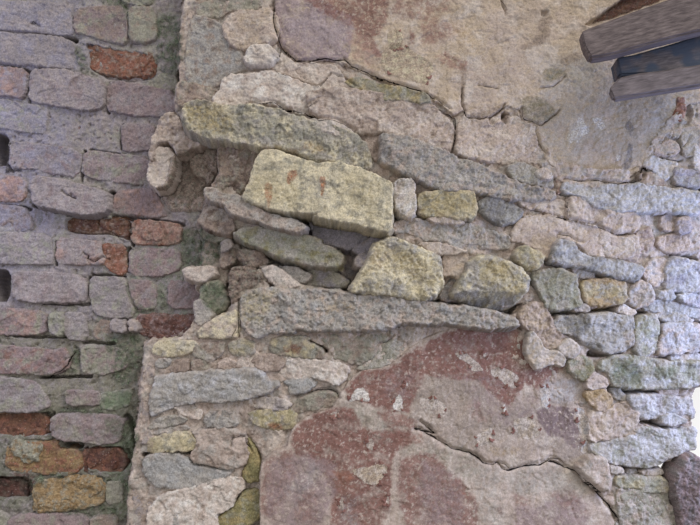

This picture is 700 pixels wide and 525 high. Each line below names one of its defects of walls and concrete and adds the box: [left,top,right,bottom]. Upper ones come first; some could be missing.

crack [259,5,504,149]
crack [414,422,620,525]